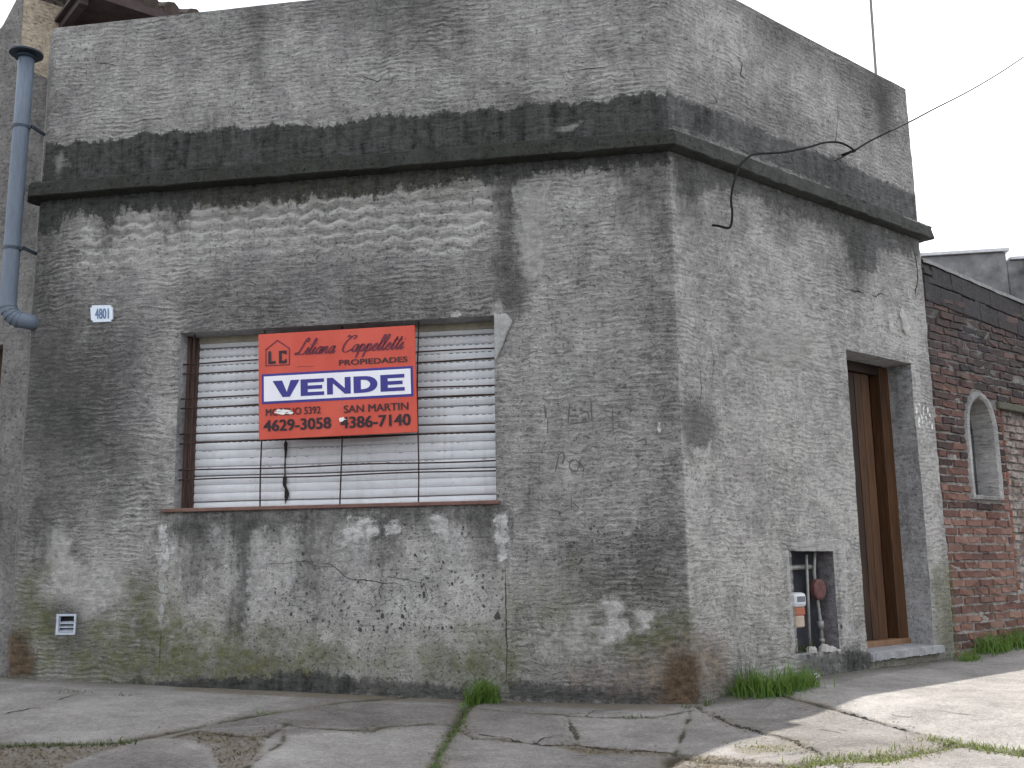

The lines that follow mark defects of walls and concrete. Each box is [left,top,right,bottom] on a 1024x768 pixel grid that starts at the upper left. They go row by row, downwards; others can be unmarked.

damp [42,90,917,221]
damp [38,151,919,312]
flaking render [493,511,510,562]
crack [267,561,428,602]
damp [125,669,469,700]
damp [506,636,729,704]